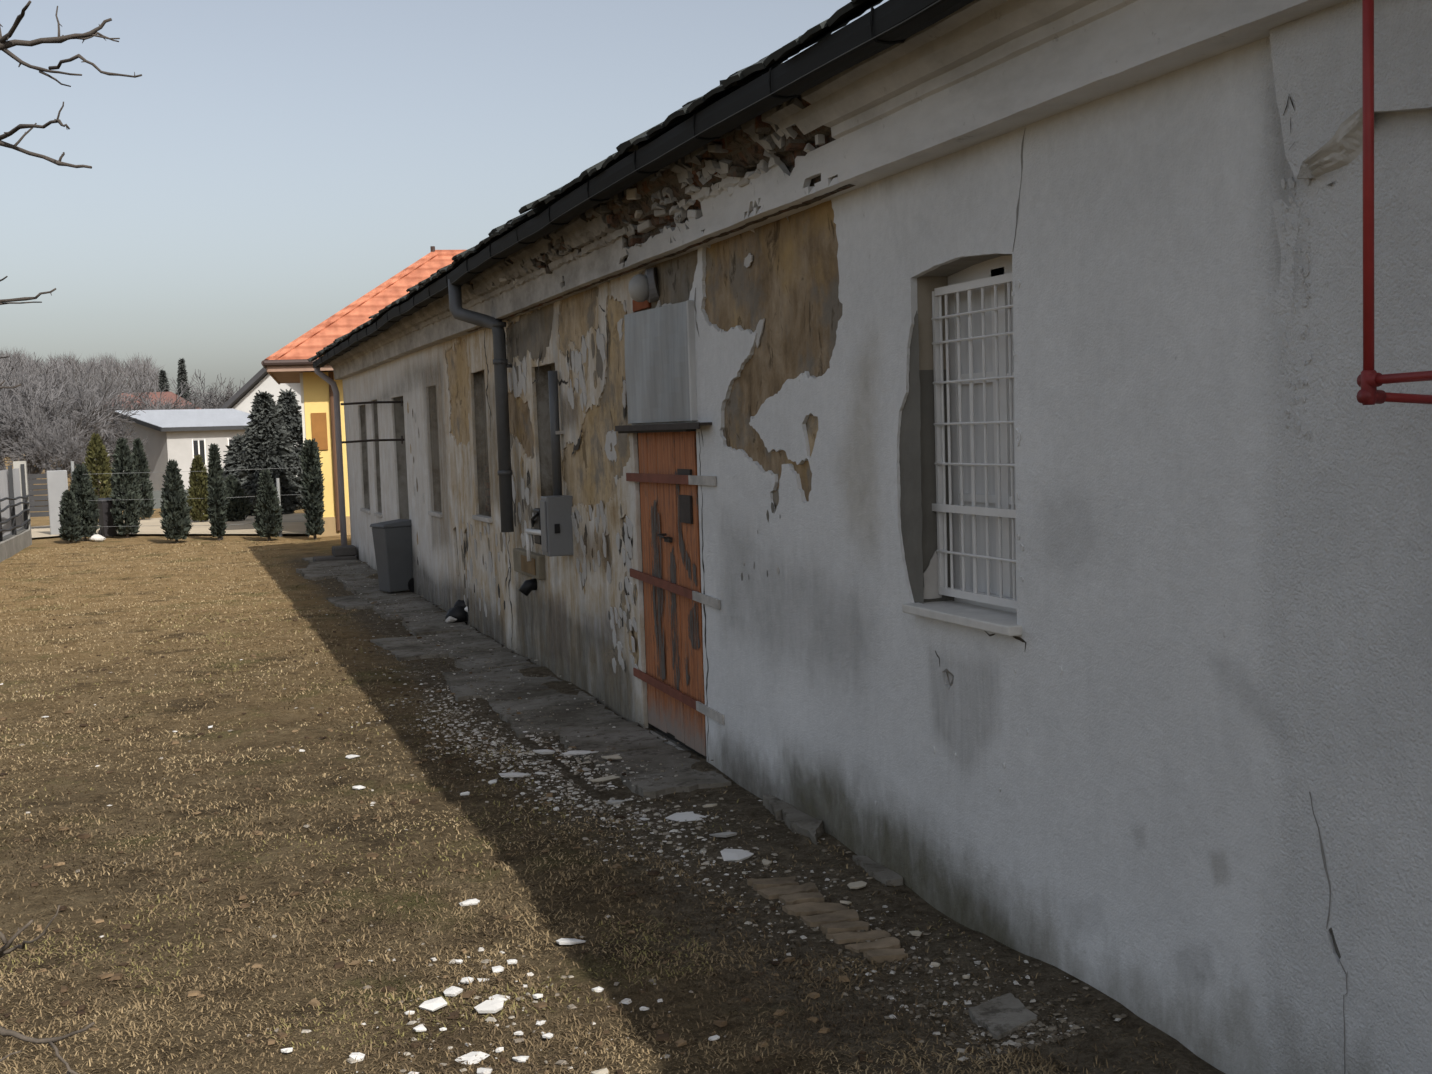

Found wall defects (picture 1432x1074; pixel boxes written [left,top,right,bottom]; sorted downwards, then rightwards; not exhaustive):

spalling [626,188,669,246]
spalling [692,144,768,187]
crack [1013,130,1025,248]
spalling [446,339,470,447]
spalling [456,200,843,691]
leakage [796,772,1014,950]
crack [1309,792,1331,929]
crack [1339,960,1348,1074]